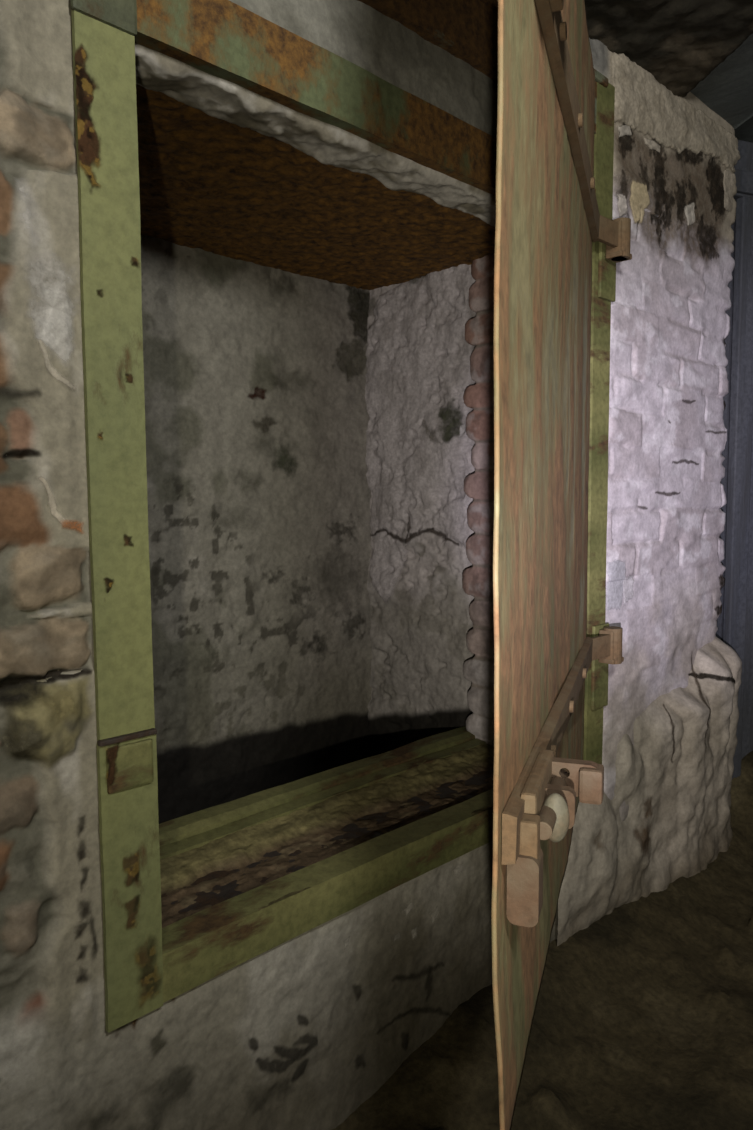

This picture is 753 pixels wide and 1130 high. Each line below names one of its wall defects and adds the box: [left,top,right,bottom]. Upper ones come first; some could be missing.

corrosion [75,45,100,187]
damp [617,123,725,261]
crack [371,516,459,546]
crack [663,704,675,762]
crack [688,657,735,750]
corrosion [123,851,139,928]